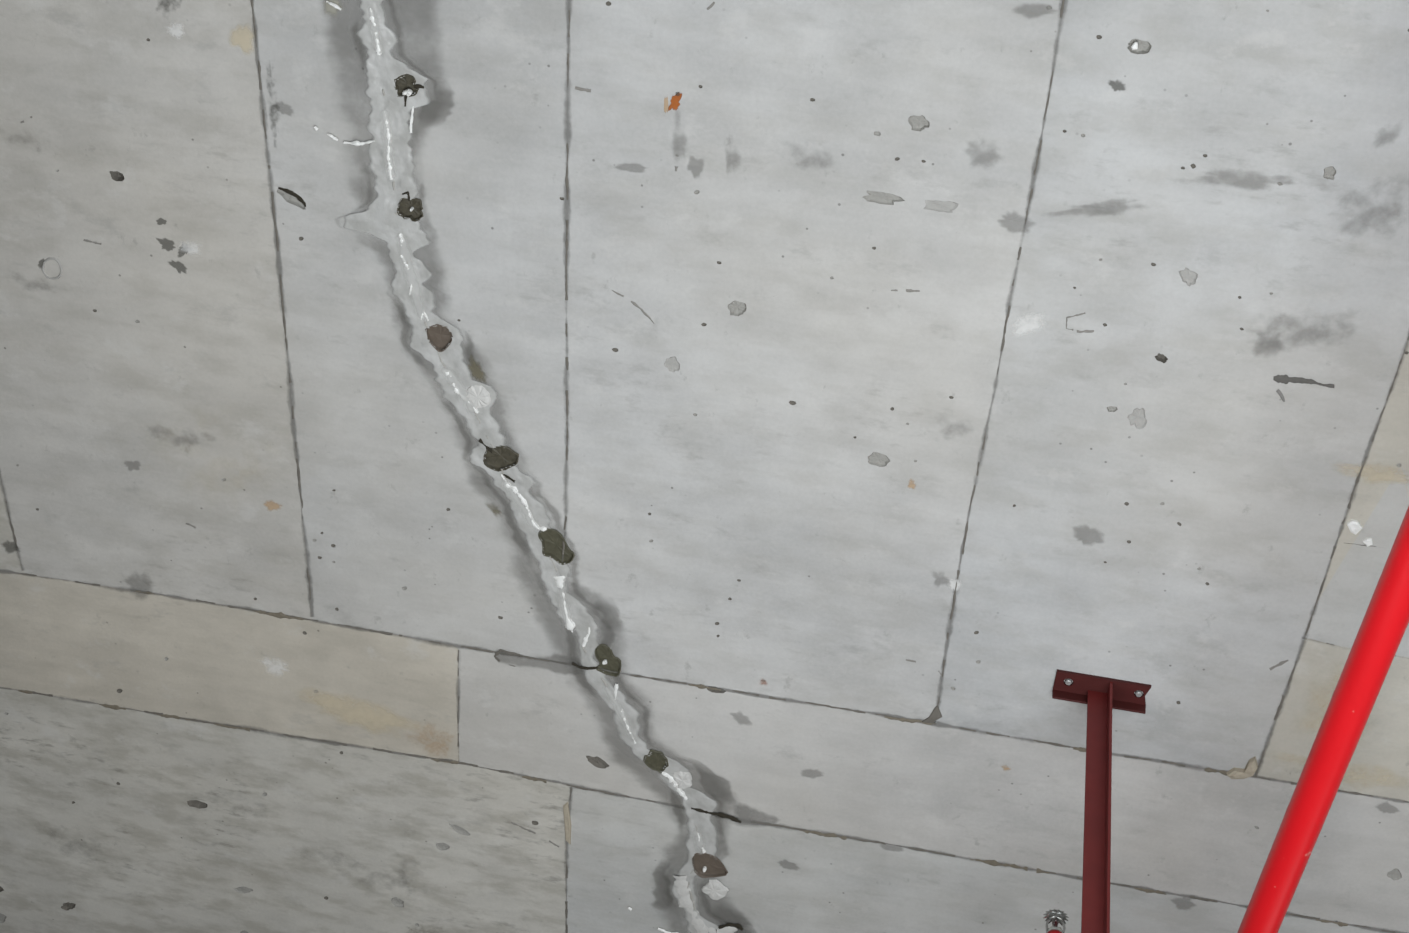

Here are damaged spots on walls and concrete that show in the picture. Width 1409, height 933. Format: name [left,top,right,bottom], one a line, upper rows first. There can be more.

leakage [326,0,341,14]
crack [314,0,743,933]
leakage [494,649,549,667]
leakage [737,807,757,825]